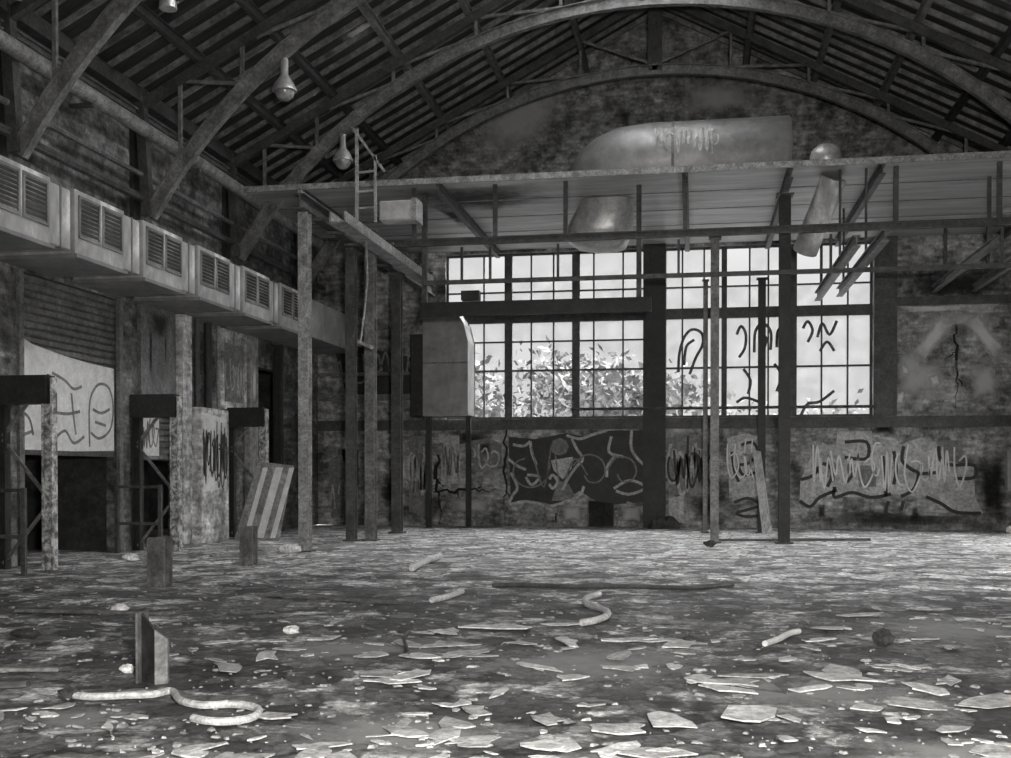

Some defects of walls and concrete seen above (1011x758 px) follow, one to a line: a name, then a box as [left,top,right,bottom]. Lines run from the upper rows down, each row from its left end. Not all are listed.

peeling [798,606,1011,651]
peeling [201,623,1011,733]
peeling [0,698,149,740]
peeling [130,741,275,758]
peeling [292,687,509,758]
peeling [520,711,698,758]
peeling [878,725,1011,758]